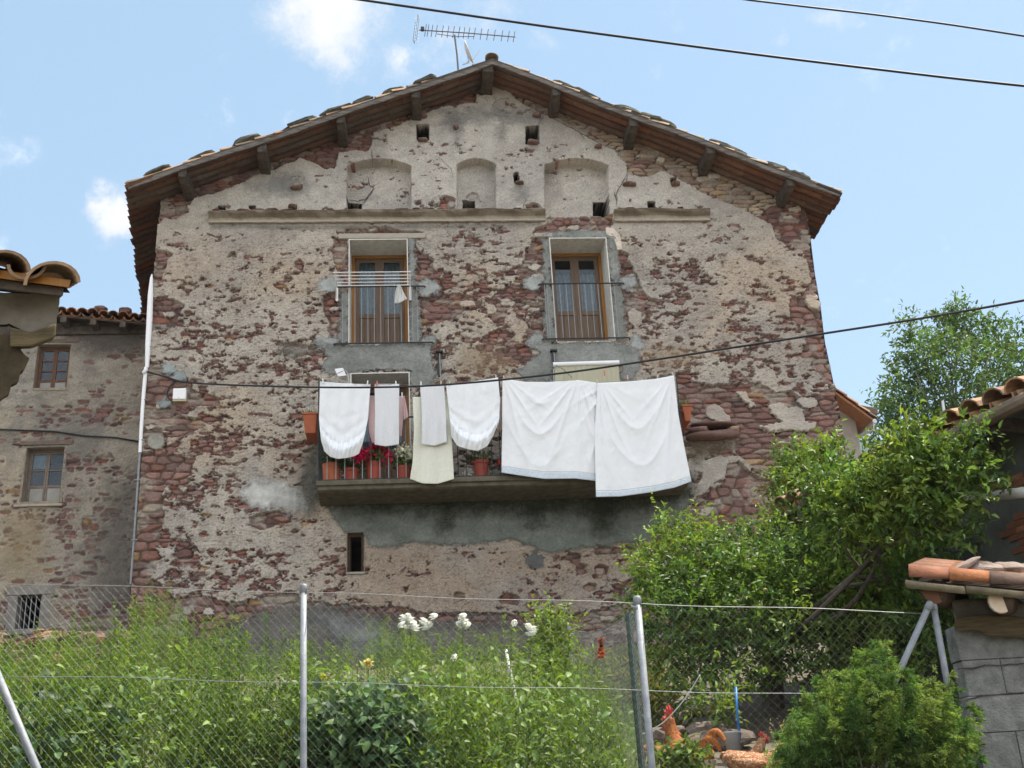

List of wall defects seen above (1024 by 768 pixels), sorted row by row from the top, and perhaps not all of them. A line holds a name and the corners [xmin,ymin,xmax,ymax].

flaking render [159,90,480,224]
flaking render [154,251,173,281]
flaking render [152,299,184,333]
flaking render [413,242,508,327]
flaking render [512,94,845,567]
flaking render [143,362,220,439]
flaking render [128,449,674,647]